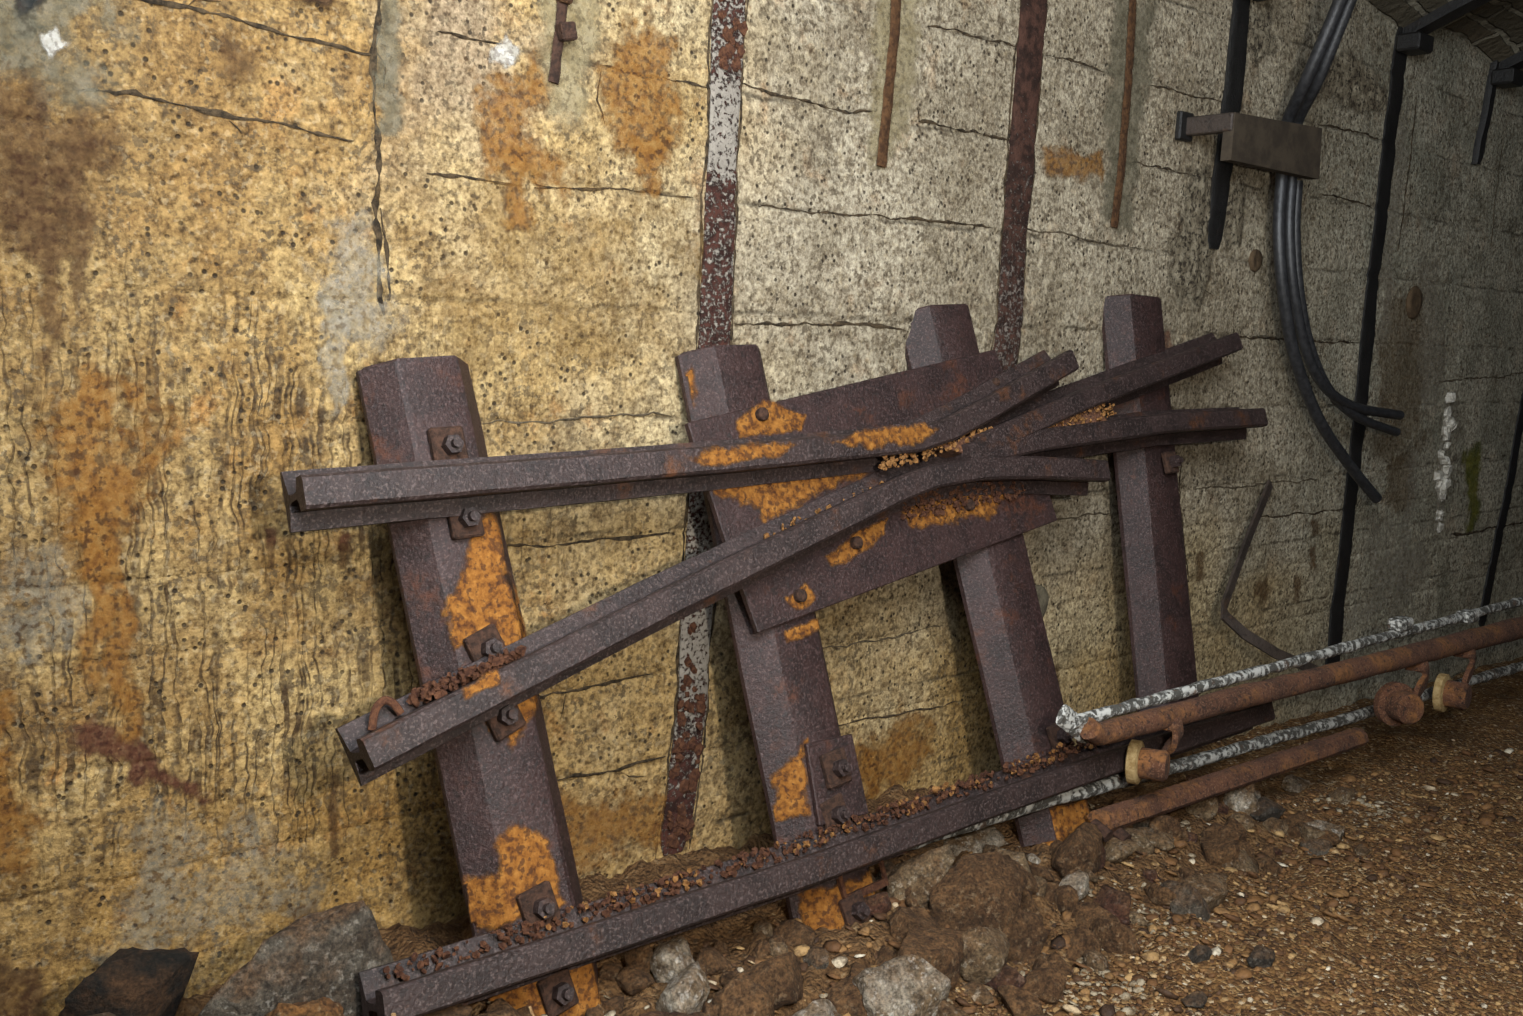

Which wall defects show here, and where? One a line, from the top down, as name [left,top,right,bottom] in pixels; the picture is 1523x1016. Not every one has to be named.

crack [82,0,391,315]
rust [477,1,568,231]
rust [599,19,681,196]
rust [1045,0,1137,228]
damp [1434,392,1482,533]
rust [35,364,212,804]